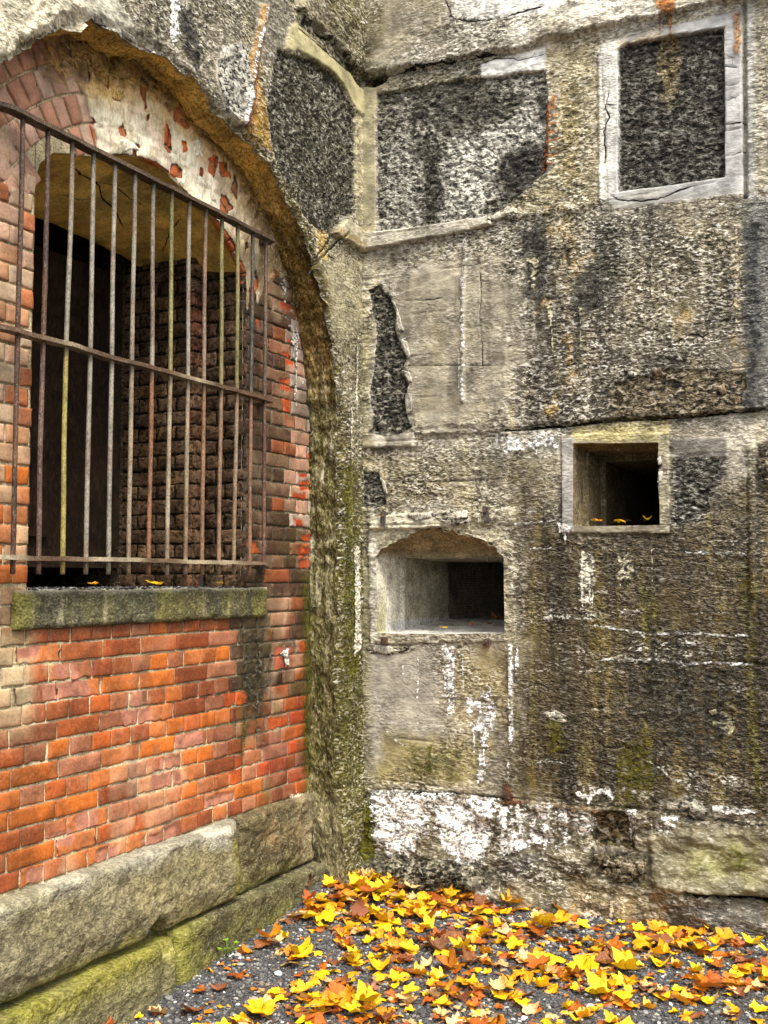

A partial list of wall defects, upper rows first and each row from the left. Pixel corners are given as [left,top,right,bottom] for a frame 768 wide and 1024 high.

rust [656,0,676,48]
rust [543,95,561,171]
crack [603,93,617,162]
crack [58,168,144,227]
flaking render [75,12,296,413]
spalling [487,206,518,226]
crack [613,181,714,202]
leakage [350,327,359,451]
flaking render [368,285,413,436]
leakage [353,544,363,657]
efflorescence [370,644,614,865]